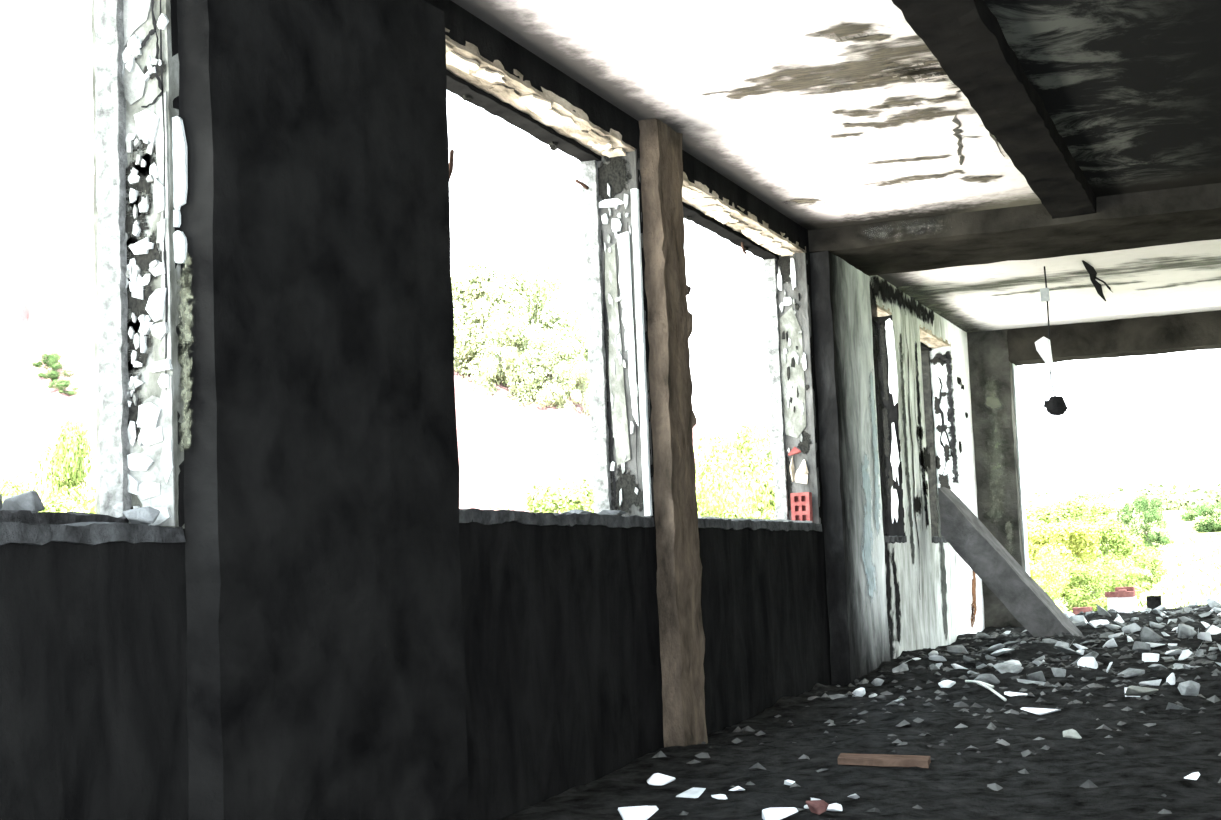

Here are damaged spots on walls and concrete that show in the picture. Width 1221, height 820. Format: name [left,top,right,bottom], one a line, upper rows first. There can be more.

flaking render [122,0,193,526]
peeling [446,43,644,516]
peeling [682,185,813,511]
damp [701,23,976,138]
peeling [880,318,900,523]
damp [863,155,1002,187]
spalling [915,377,964,516]